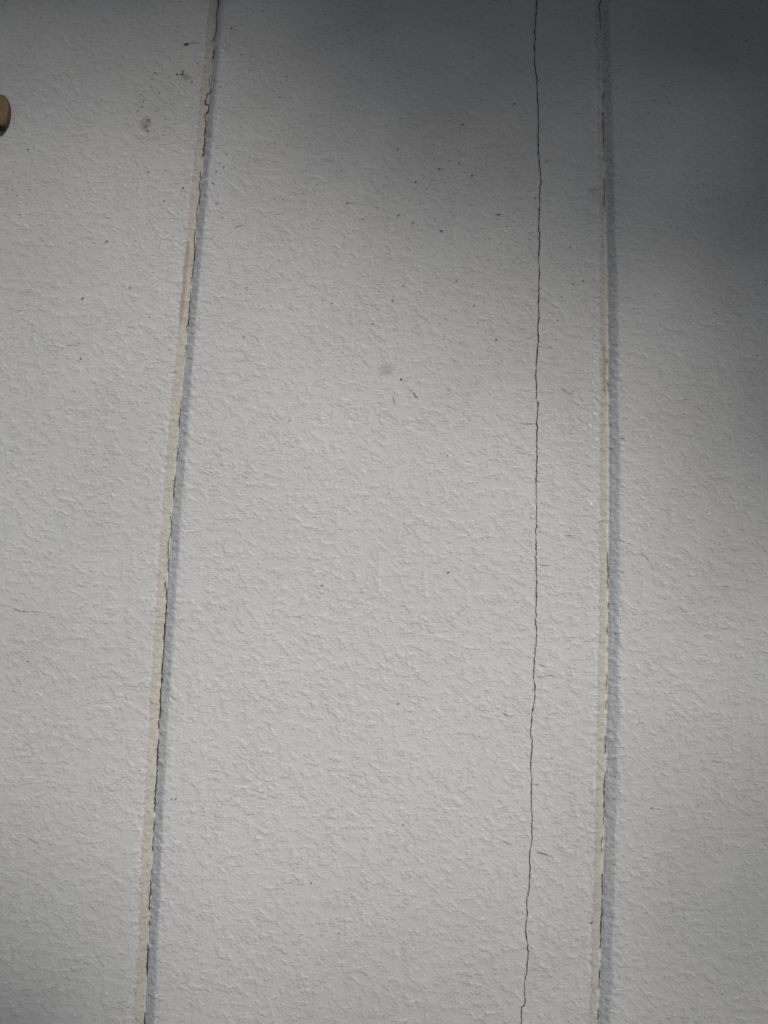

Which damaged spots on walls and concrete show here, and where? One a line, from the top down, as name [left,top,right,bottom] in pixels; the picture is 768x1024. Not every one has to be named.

crack [503,0,556,1024]